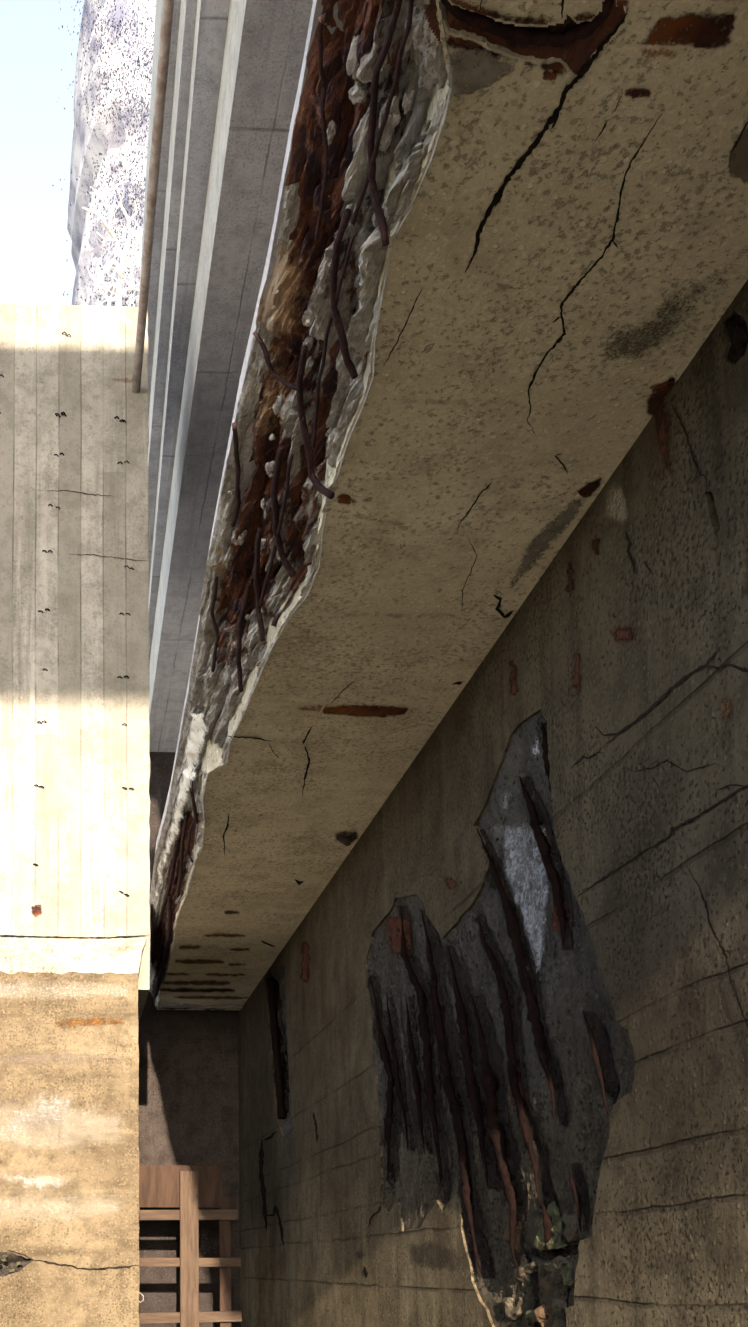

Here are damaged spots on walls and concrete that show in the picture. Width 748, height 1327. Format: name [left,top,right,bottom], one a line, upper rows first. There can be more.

rust [643,13,735,57]
crack [465,13,627,273]
crack [527,114,662,474]
rust [337,493,355,504]
spalling [149,0,628,1009]
rust [301,705,408,717]
crack [573,647,748,897]
spalling [367,711,635,1327]
crack [686,866,748,1029]
spalling [0,1252,34,1277]
crack [7,1250,139,1270]
crack [259,1131,284,1246]